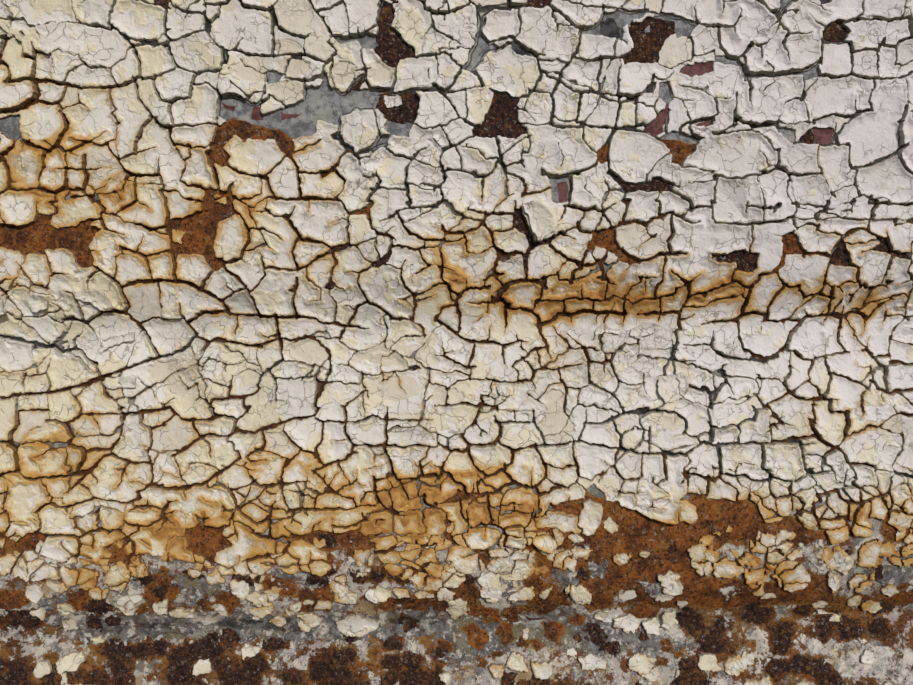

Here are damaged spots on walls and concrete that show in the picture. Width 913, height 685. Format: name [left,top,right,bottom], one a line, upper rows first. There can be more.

crack [0,0,395,232]
crack [334,0,913,151]
peeling [0,162,58,227]
rust [0,65,318,307]
peeling [501,244,622,322]
rust [407,208,912,340]
rust [0,394,913,685]
peeling [414,499,603,619]
peeling [564,569,688,635]
peeling [686,525,811,599]
peeling [33,650,86,685]
peeling [697,650,773,685]